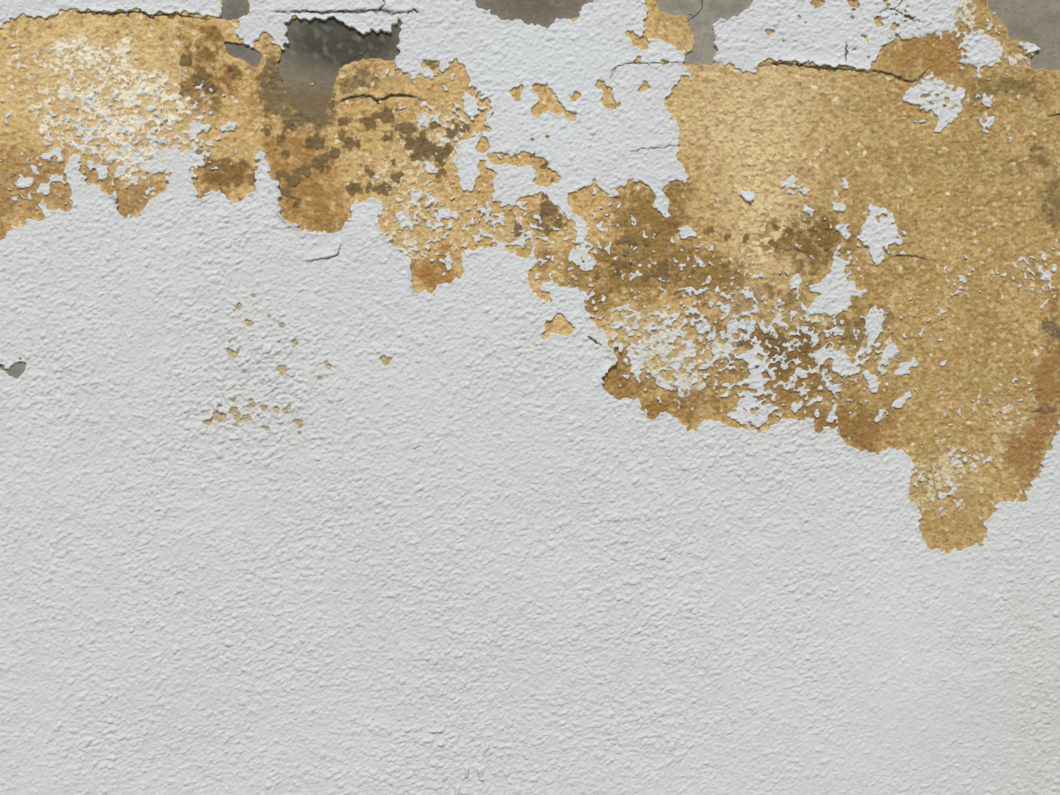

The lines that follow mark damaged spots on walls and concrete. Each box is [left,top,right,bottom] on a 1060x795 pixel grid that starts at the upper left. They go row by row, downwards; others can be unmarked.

crack [343,50,368,64]
crack [761,44,927,83]
crack [342,93,419,104]
peeling [0,0,1060,555]